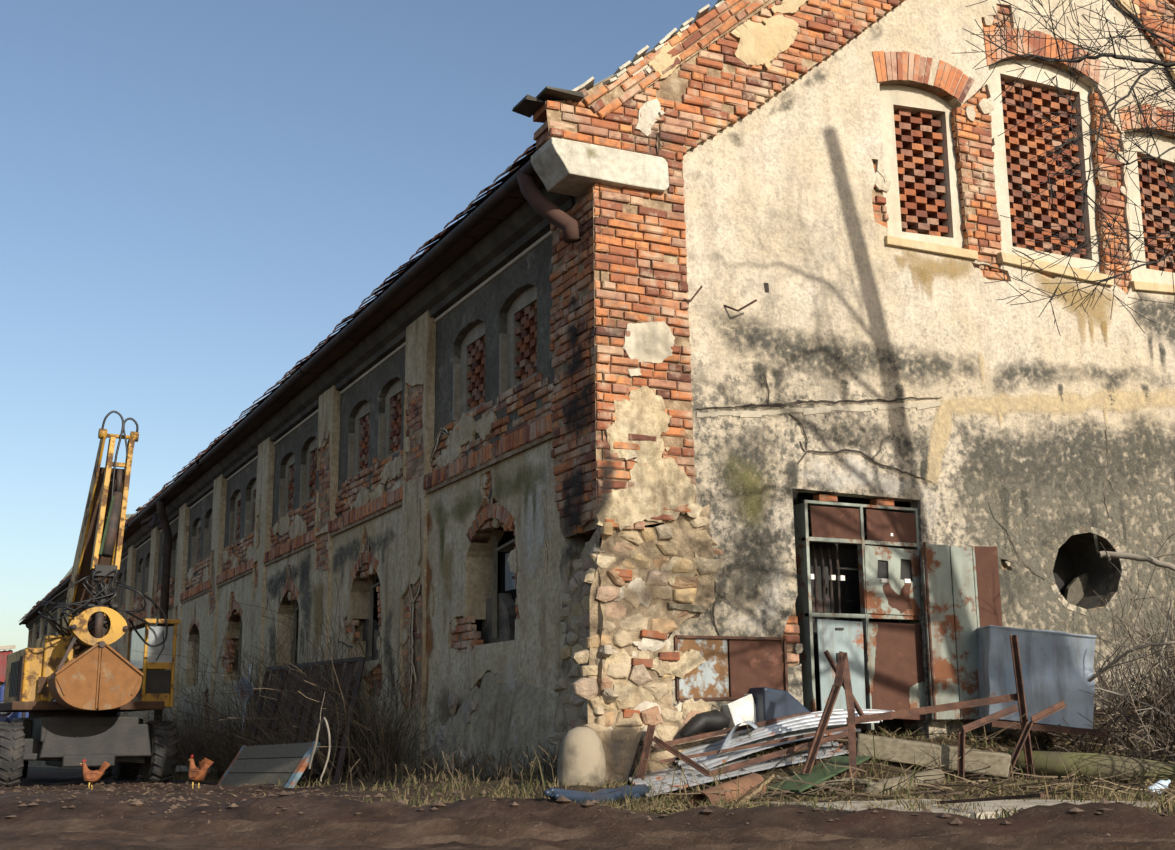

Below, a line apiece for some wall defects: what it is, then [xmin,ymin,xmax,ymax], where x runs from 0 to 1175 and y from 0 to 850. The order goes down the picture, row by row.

flaking render [729,0,808,70]
flaking render [1115,0,1140,16]
water stain [725,324,974,402]
water stain [996,363,1072,396]
water stain [1135,296,1175,365]
flaking render [350,385,497,510]
water stain [786,461,798,494]
crack [696,374,942,482]
spalling [546,368,724,786]
water stain [717,435,778,622]
water stain [957,419,1175,657]
flaking render [451,616,483,654]